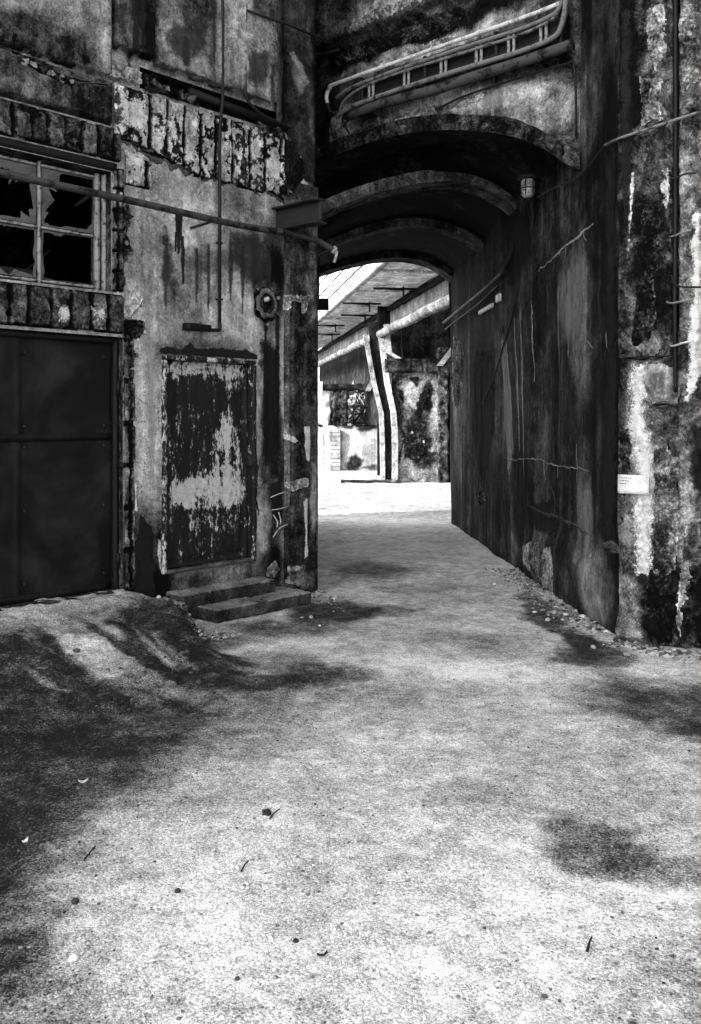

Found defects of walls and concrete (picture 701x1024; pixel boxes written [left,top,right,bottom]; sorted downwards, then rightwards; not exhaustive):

spalling [12,102,42,118]
spalling [60,120,86,150]
spalling [110,59,200,129]
peeling [164,117,180,141]
peeling [125,148,145,168]
flaking render [266,153,305,193]
leakage [160,226,178,309]
leakage [195,244,210,309]
peeling [57,305,70,322]
leakage [689,423,701,492]
crack [506,444,594,538]